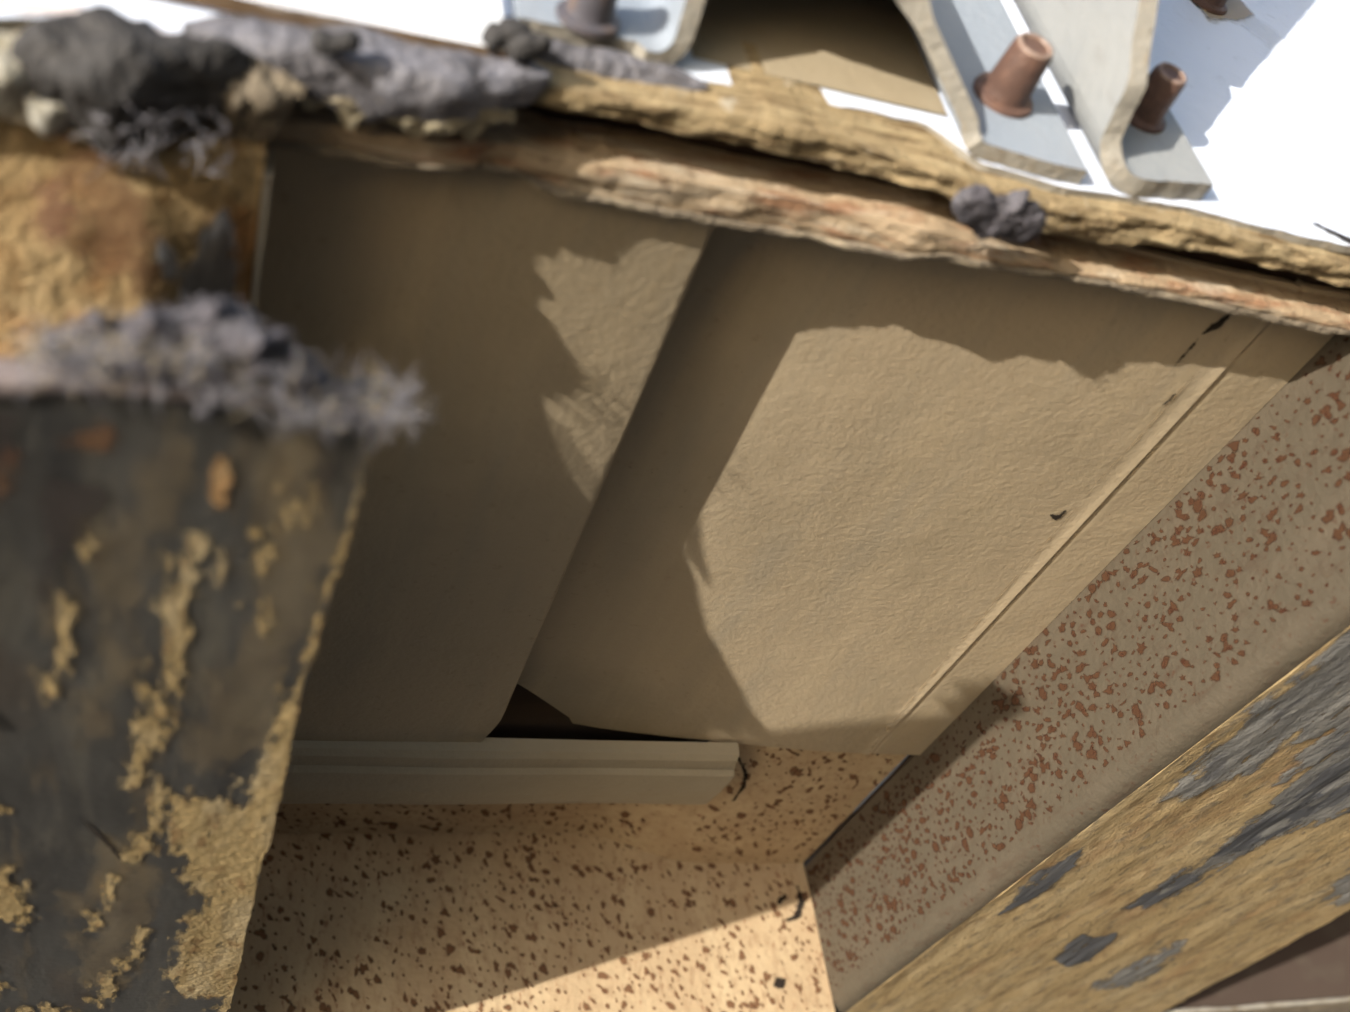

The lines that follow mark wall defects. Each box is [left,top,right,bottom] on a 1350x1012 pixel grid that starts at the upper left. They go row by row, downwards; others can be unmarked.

crack [1313,222,1350,243]
rust [209,456,233,509]
peeling [248,486,316,575]
peeling [323,488,361,598]
peeling [41,592,76,698]
rust [237,336,1350,1012]
peeling [83,532,324,1012]
peeling [1158,630,1350,895]
peeling [0,865,33,932]
peeling [16,1002,72,1012]
spalling [1053,932,1117,967]
peeling [1089,939,1188,990]